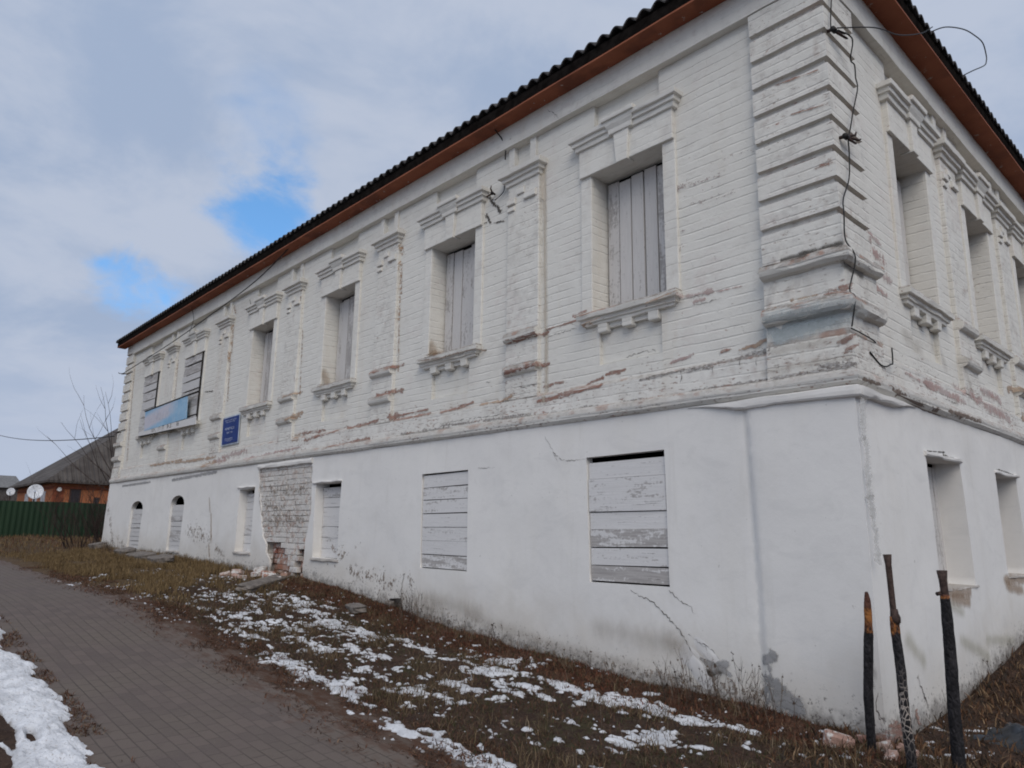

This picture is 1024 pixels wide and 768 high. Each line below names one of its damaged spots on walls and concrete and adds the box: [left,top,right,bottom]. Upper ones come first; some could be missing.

peeling [790,283,852,302]
peeling [868,232,892,296]
peeling [504,361,550,375]
peeling [623,333,859,402]
peeling [862,372,1024,424]
spalling [150,368,626,578]
crack [632,591,714,652]